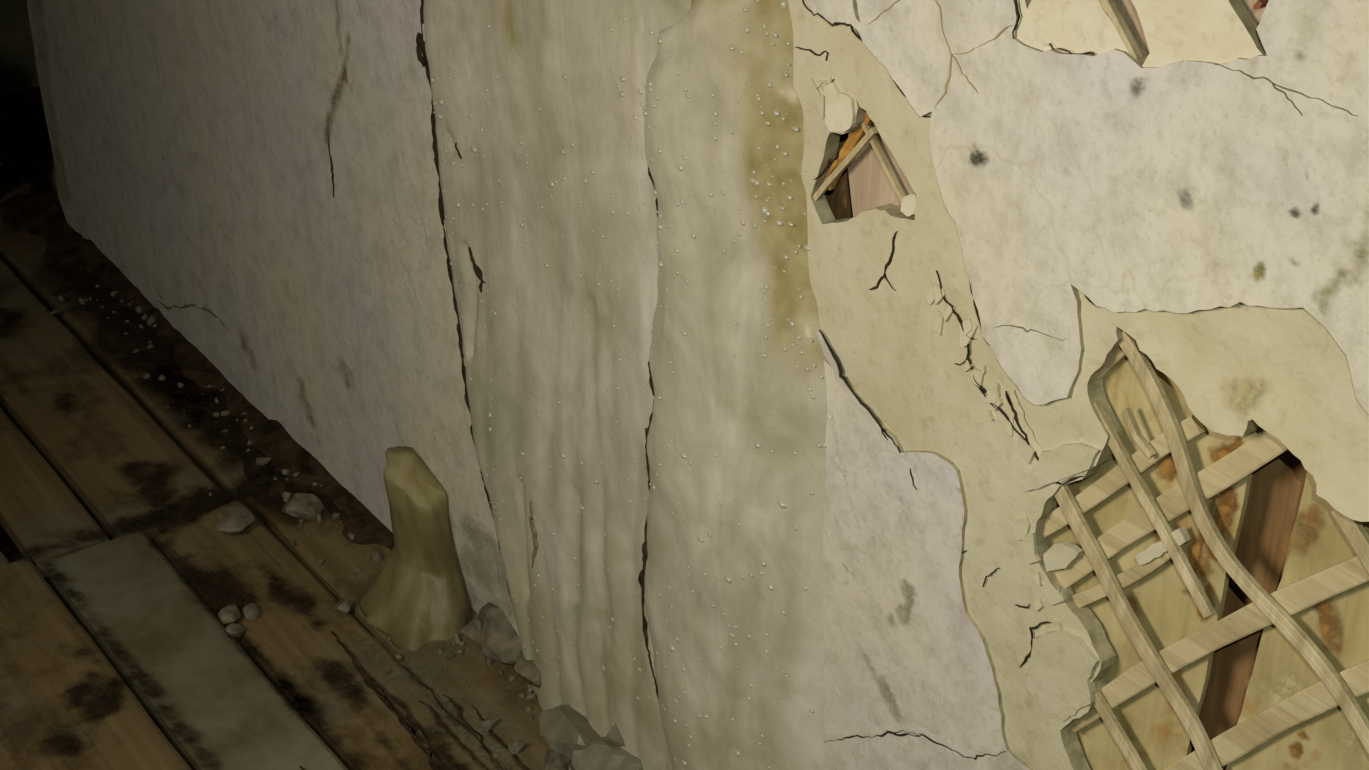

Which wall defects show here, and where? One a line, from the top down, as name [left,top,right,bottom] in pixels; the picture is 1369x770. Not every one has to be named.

crack [327,135,335,197]
crack [869,231,897,291]
crack [936,270,1084,485]
flaking render [788,0,1369,770]
water stain [15,271,368,769]
water stain [361,641,529,770]
crack [824,724,1007,760]